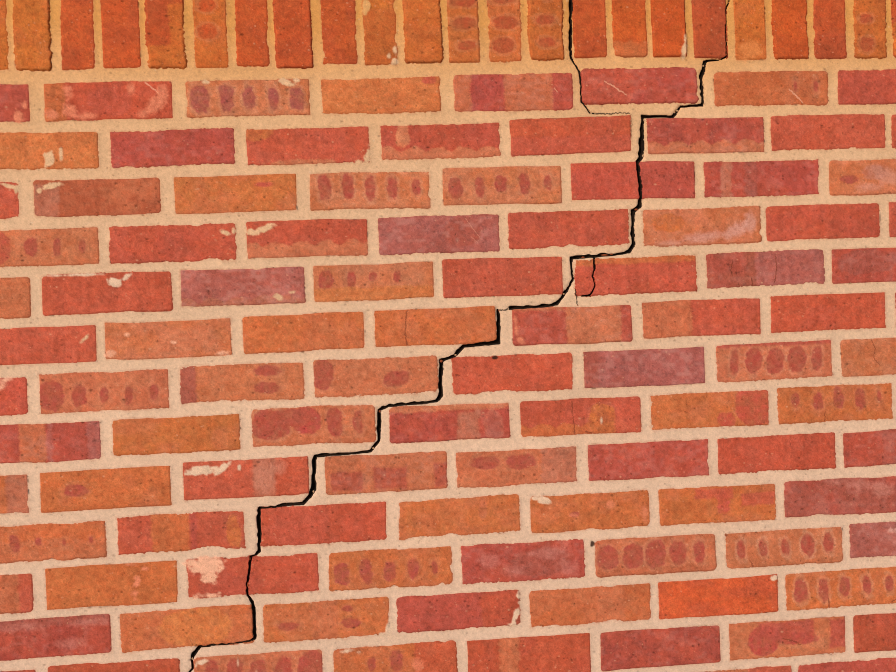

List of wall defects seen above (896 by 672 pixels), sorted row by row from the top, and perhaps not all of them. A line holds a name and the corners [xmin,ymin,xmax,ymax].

crack [189,0,730,672]